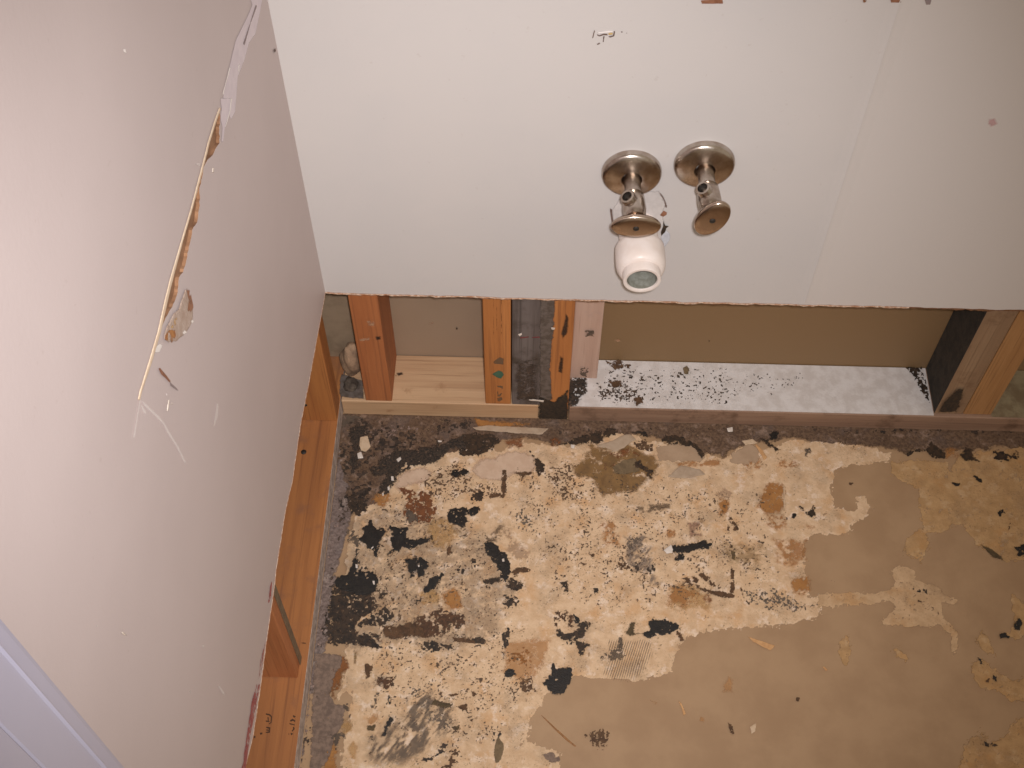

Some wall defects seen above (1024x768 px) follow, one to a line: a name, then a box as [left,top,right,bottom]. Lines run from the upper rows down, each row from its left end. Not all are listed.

mould [568,359,797,406]
damp [906,367,963,412]
peeling [357,436,371,459]
peeling [395,468,431,488]
peeling [472,451,536,481]
flaking render [597,434,636,452]
peeling [656,443,705,478]
peeling [730,439,767,466]
damp [317,414,818,768]
spalling [491,731,504,763]